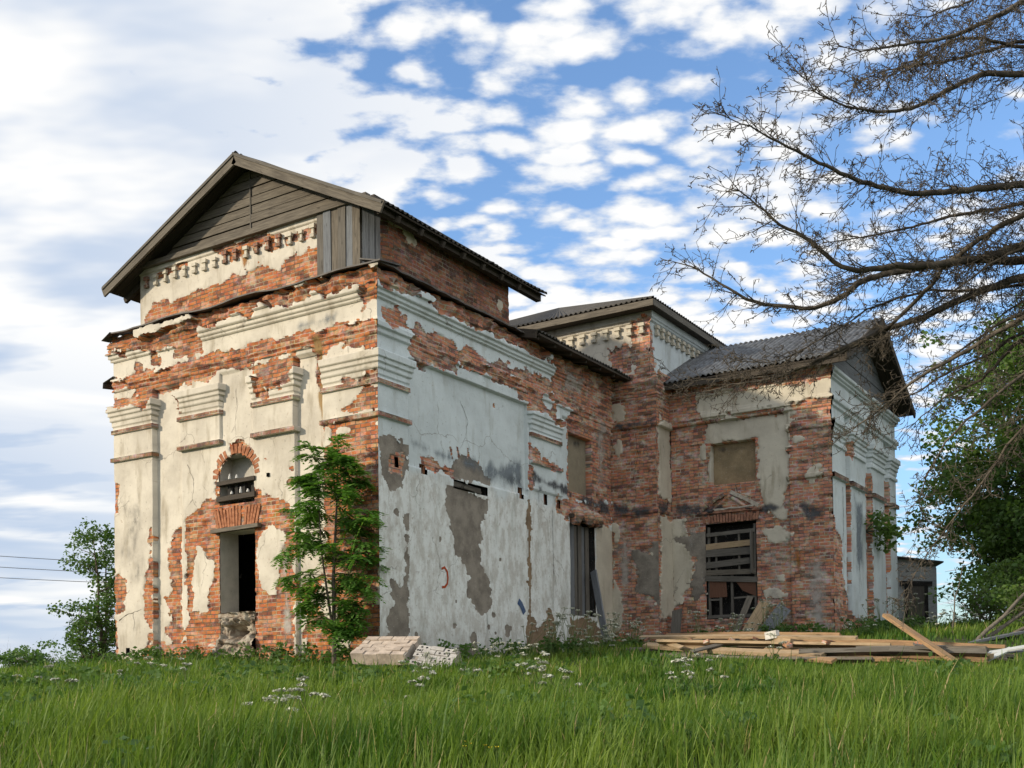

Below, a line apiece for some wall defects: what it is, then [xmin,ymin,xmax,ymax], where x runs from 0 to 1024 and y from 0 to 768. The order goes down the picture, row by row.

flaking render [106,221,657,663]
flaking render [695,378,832,543]
flaking render [631,515,708,618]